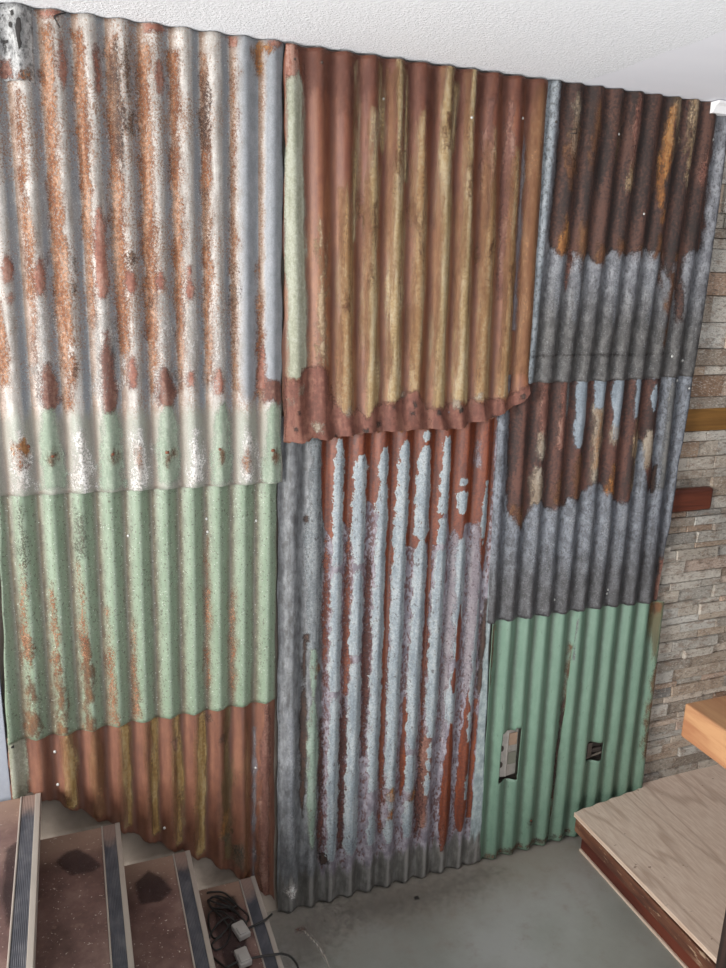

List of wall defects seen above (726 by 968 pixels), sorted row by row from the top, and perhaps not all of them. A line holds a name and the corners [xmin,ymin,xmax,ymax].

rust [251,40,282,76]
rust [0,9,242,414]
rust [302,47,542,299]
rust [548,81,716,345]
rust [127,425,153,490]
rust [253,260,661,580]
rust [283,637,329,865]
rust [337,697,348,849]
rust [359,557,372,758]
peeling [303,416,497,862]
rust [417,598,430,769]
rust [477,598,496,698]